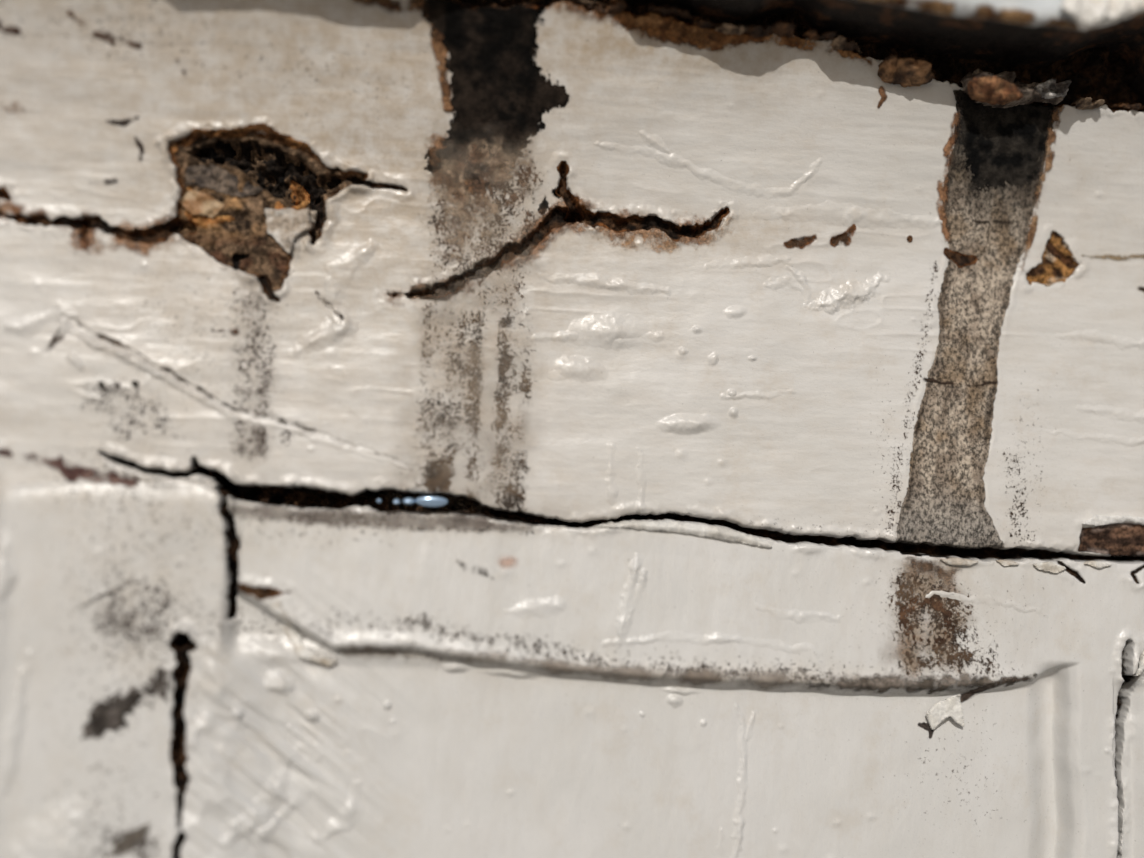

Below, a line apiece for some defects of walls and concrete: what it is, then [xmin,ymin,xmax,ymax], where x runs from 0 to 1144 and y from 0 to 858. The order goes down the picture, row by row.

crack [0,186,197,255]
peeling [168,123,407,302]
damp [229,0,572,536]
crack [388,161,730,298]
peeling [1026,231,1080,286]
damp [340,89,1064,702]
crack [101,452,1144,619]
peeling [940,557,978,566]
peeling [1078,515,1144,569]
crack [169,632,197,858]
peeling [926,694,964,730]
crack [1115,648,1137,801]